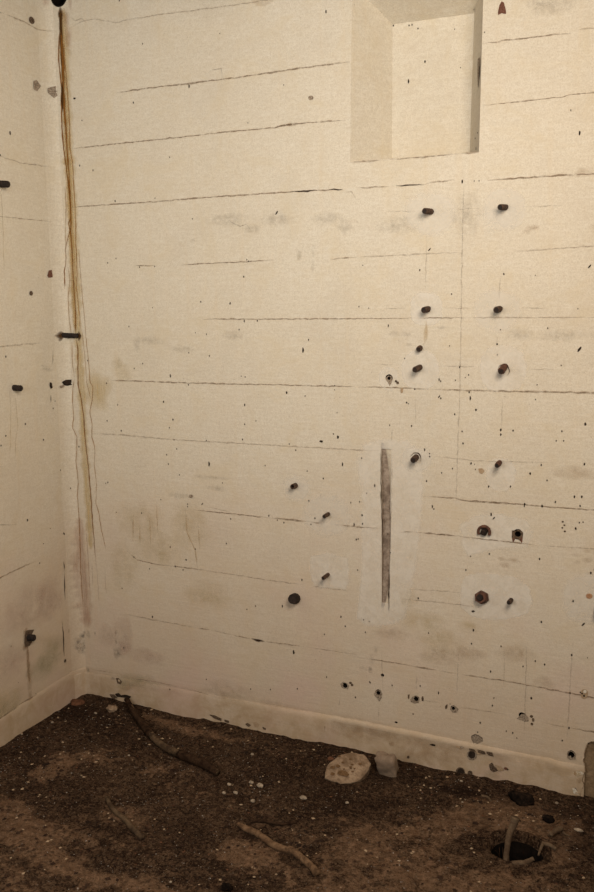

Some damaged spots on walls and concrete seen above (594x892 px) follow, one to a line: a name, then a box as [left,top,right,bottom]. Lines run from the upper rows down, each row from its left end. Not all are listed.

rust [57,9,105,548]